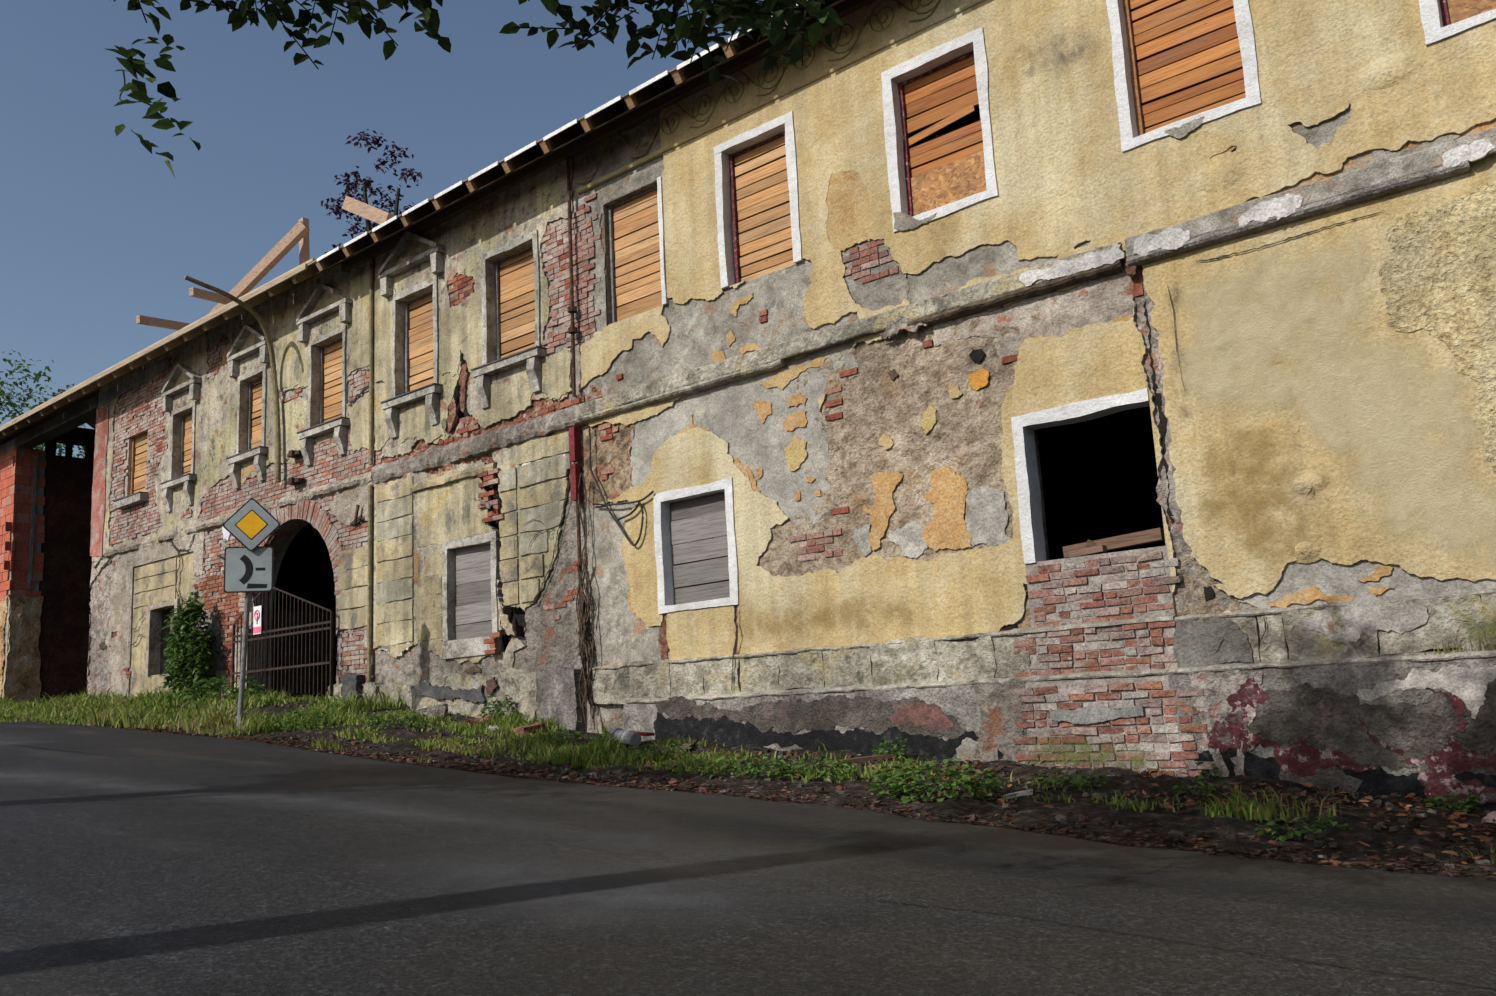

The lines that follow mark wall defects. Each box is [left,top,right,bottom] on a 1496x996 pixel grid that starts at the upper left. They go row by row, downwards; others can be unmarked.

spalling [1165,116,1205,140]
spalling [1290,105,1352,148]
peeling [1238,119,1496,226]
crack [447,336,473,434]
peeling [183,124,1191,695]
crack [1132,212,1383,587]
flaking render [87,354,173,696]
peeling [1173,544,1496,616]
peeling [1206,677,1379,792]
peeling [1359,688,1496,803]